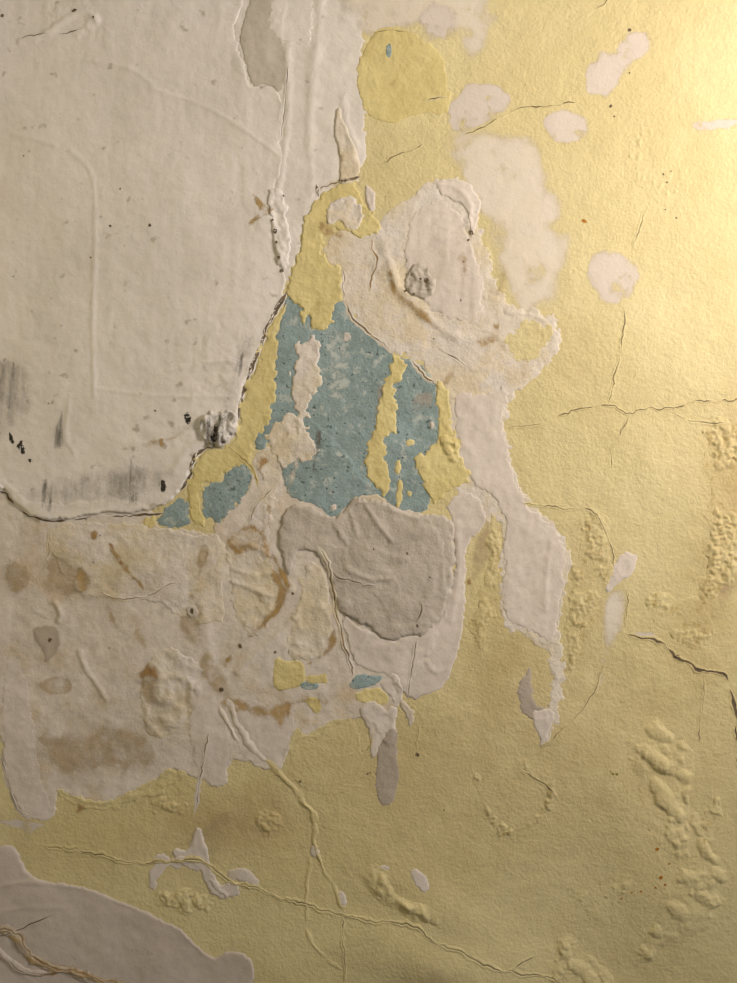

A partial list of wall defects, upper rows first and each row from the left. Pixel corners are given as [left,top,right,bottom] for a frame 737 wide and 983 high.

peeling [356,26,451,124]
crack [464,99,578,135]
peeling [142,108,471,529]
crack [504,308,737,470]
crack [523,502,615,566]
peeling [273,651,328,714]
peeling [289,673,403,796]
peeling [533,709,555,746]
crack [517,661,607,798]
crack [624,588,737,766]
peeling [148,828,259,899]
crack [0,914,126,983]